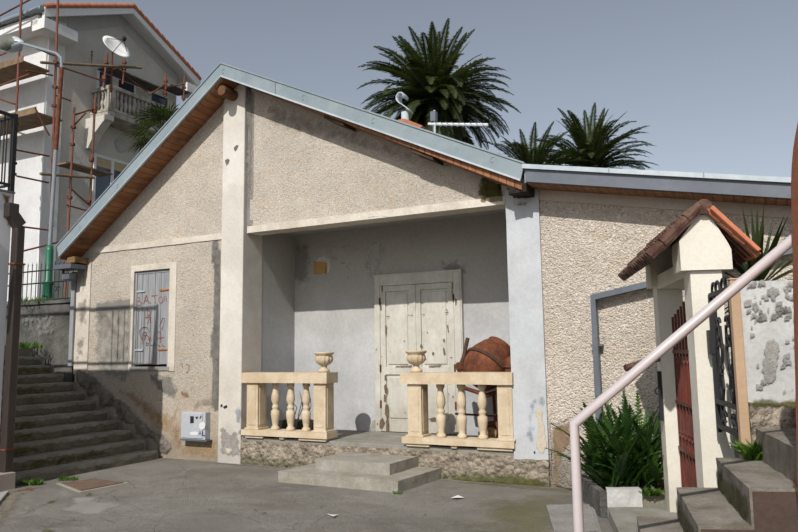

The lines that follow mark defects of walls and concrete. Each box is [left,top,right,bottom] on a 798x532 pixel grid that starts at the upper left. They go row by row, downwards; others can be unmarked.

flaking render [96,300,130,381]
peeling [744,280,794,338]
peeling [756,337,794,390]
flaking render [76,370,171,453]
peeling [220,410,241,456]
flaking render [528,398,570,486]